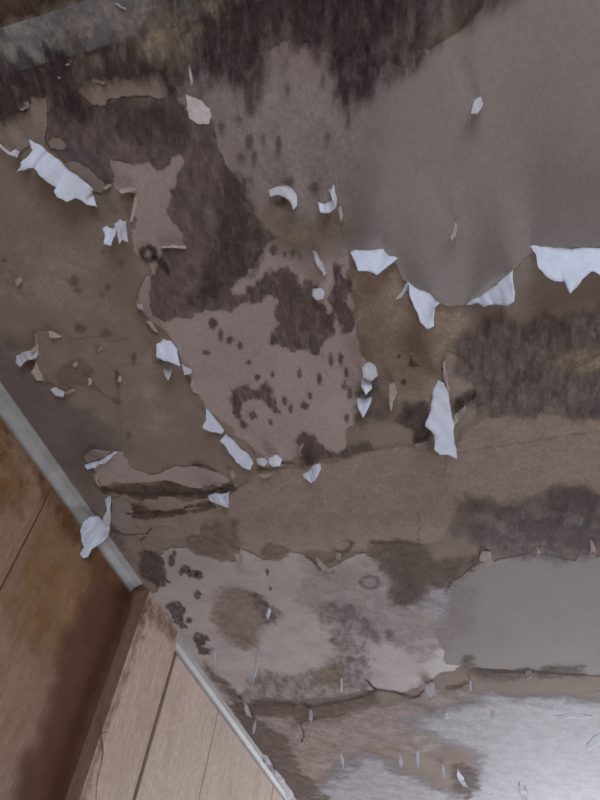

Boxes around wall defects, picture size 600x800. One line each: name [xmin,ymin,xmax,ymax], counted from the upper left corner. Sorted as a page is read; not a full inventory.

damp [0,0,600,439]
peeling [103,0,600,478]
damp [453,487,600,560]
mould [140,550,203,589]
damp [134,601,192,645]
mould [193,632,212,655]
damp [214,589,280,649]
peeling [84,449,600,800]
crack [241,680,425,743]
damp [453,764,479,800]